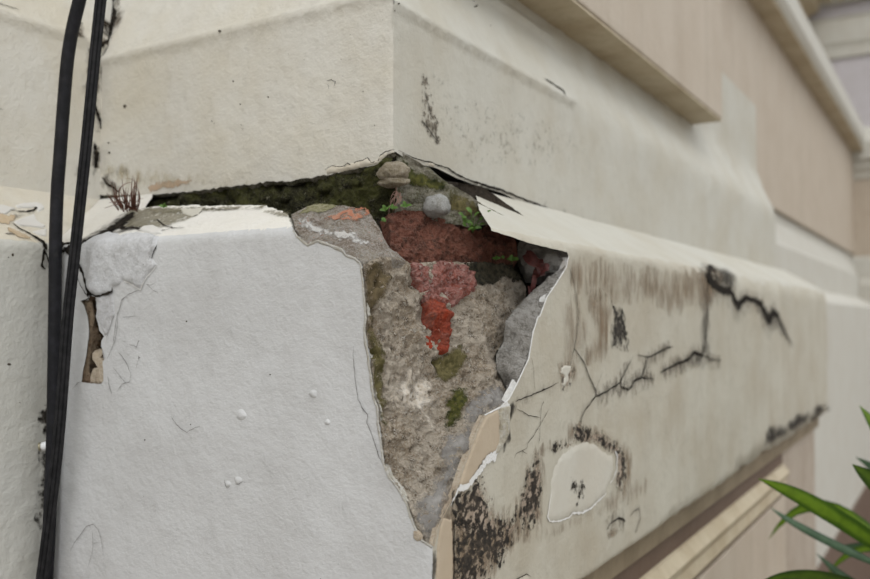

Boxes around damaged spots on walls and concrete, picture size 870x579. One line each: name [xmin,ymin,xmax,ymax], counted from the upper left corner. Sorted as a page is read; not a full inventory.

mould [422,76,440,144]
peeling [0,202,47,240]
crack [106,315,139,394]
spalling [80,150,569,579]
crack [514,358,559,458]
peeling [560,363,575,390]
water stain [572,268,629,364]
crack [571,264,792,421]
mould [447,425,630,579]